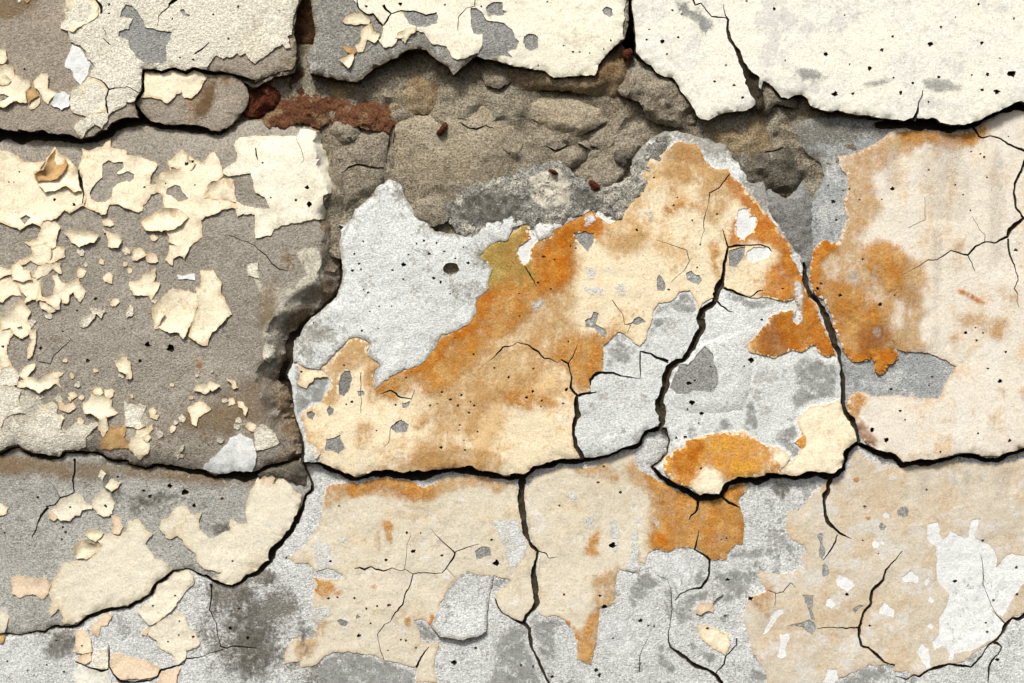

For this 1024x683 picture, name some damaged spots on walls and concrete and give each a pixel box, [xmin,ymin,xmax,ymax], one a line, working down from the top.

crack [0,45,256,144]
peeling [63,570,200,683]
peeling [0,139,345,486]
crack [342,128,395,173]
rust [322,210,648,506]
crack [0,170,1024,683]
spalling [237,0,868,280]
rust [565,572,614,664]
rust [585,432,780,560]
rust [665,125,985,375]
crack [875,93,1024,307]
peeling [902,519,1024,669]